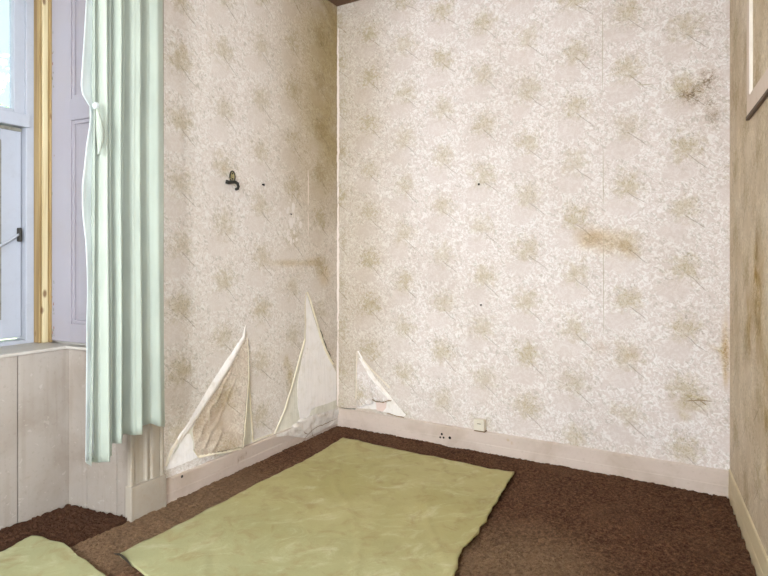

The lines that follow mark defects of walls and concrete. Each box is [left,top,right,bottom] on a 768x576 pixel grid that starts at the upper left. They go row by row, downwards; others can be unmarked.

spalling [276,334,339,438]
flaking render [166,421,198,470]